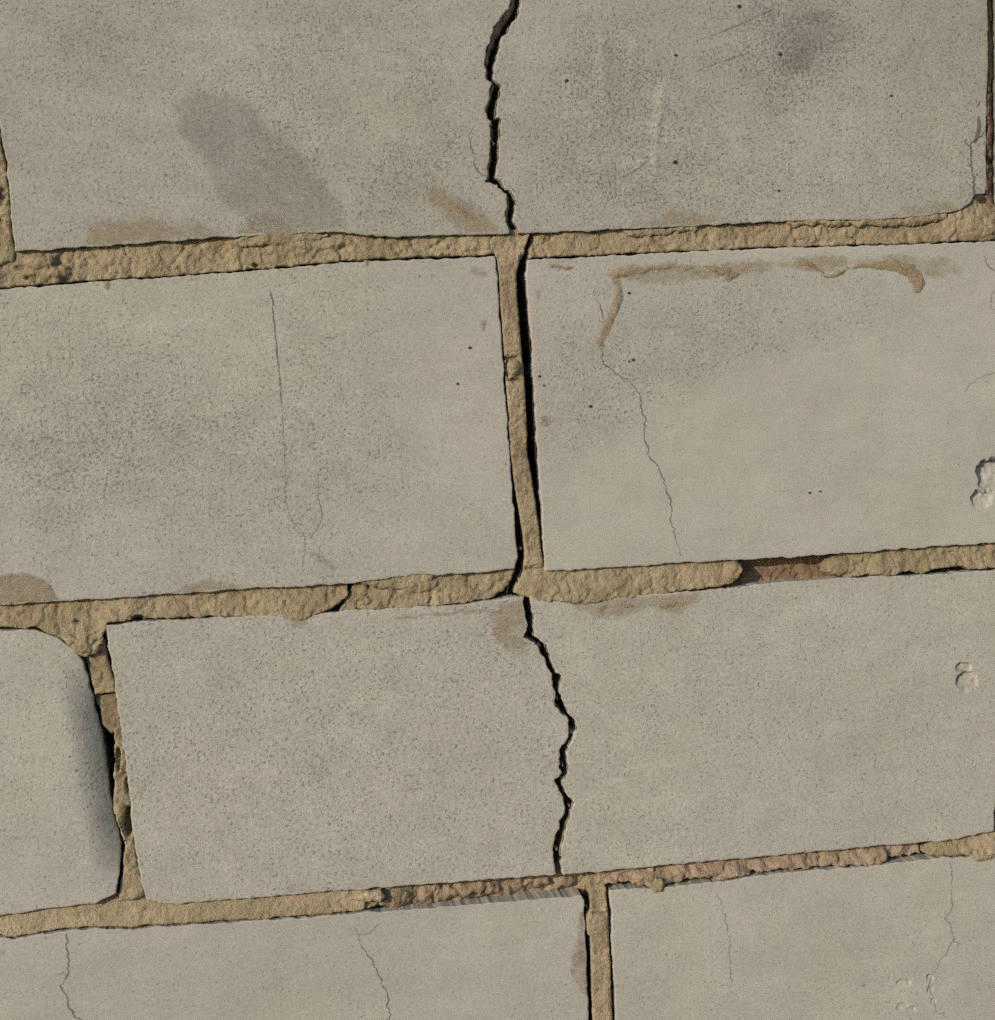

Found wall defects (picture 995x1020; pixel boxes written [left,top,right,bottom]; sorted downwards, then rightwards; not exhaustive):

crack [468,0,577,874]
crack [594,287,681,556]
crack [579,889,589,908]
crack [59,934,81,1020]
crack [356,931,391,1020]
crack [584,936,592,1020]